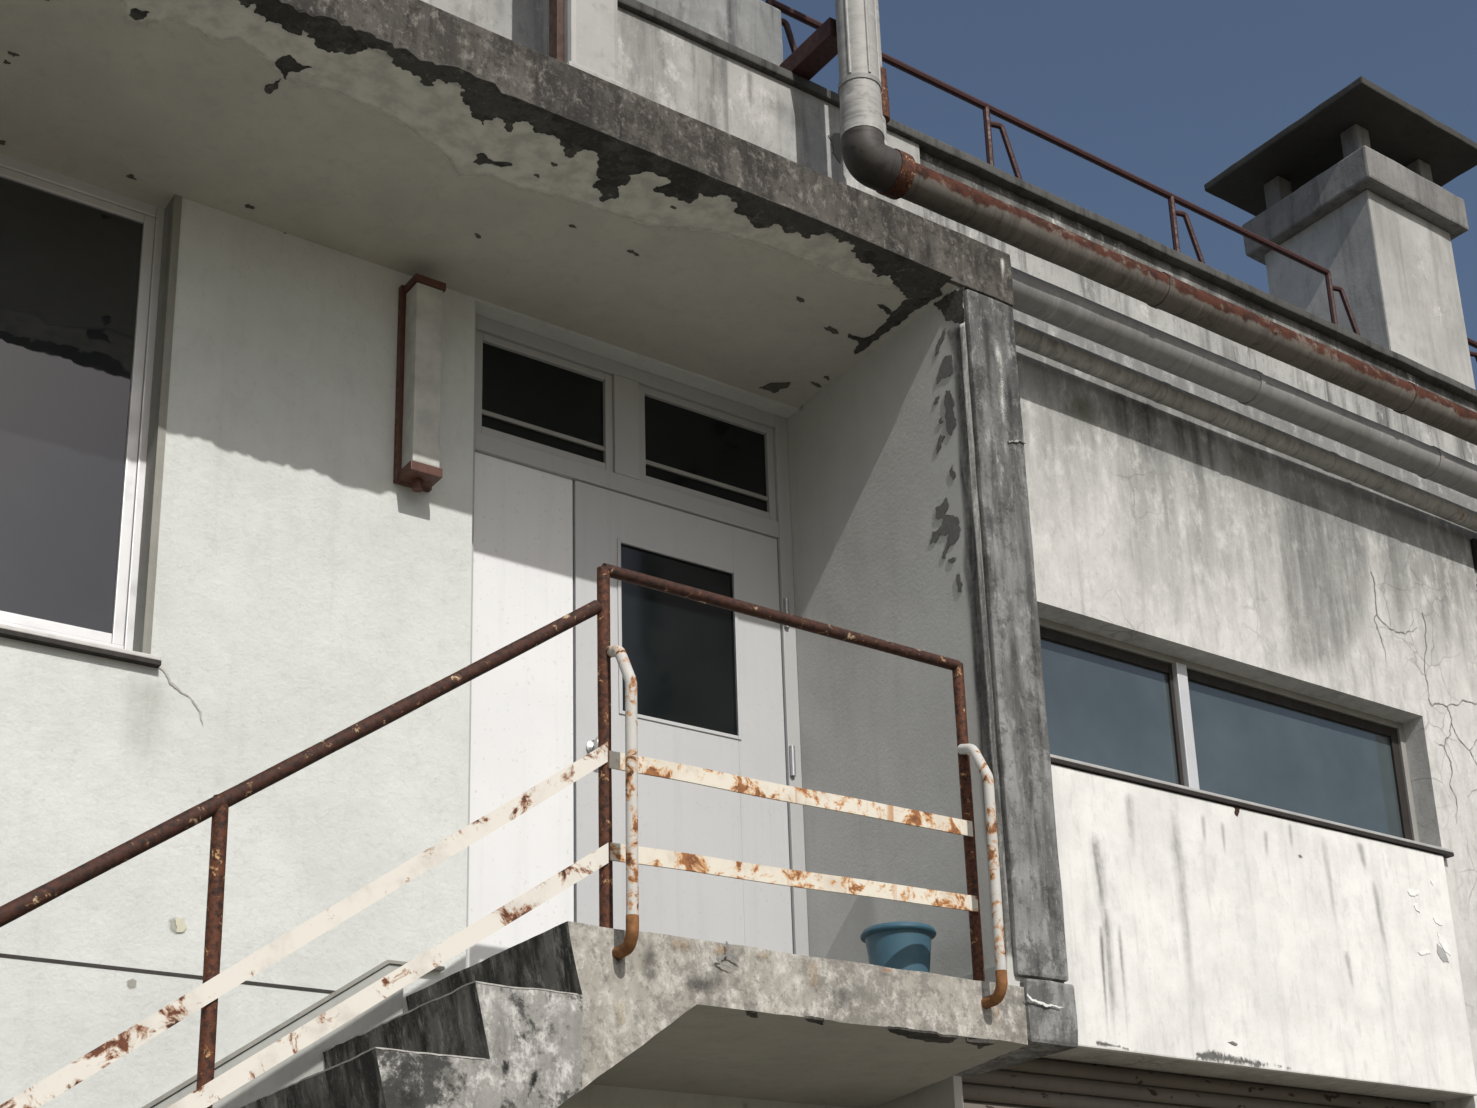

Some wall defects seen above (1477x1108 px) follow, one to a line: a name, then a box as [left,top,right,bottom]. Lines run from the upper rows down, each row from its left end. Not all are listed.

peeling [129,8,149,20]
peeling [239,0,965,454]
peeling [930,497,963,592]
crack [159,667,203,724]
crack [1371,571,1477,824]